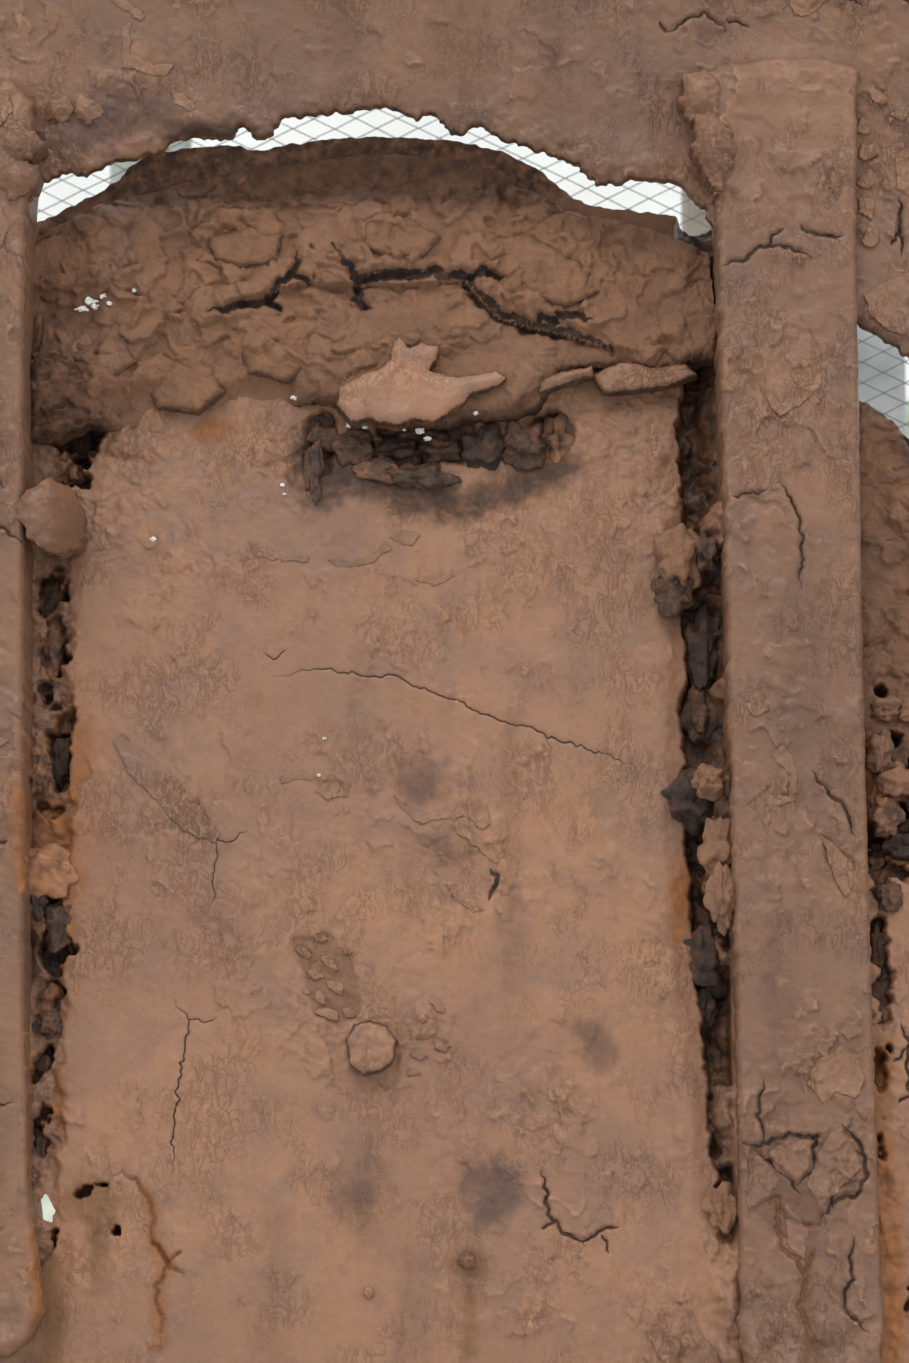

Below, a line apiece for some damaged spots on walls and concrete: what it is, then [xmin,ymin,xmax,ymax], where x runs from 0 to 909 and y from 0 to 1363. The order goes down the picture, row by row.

crack [265,650,643,768]
corrosion [859,401,909,968]
corrosion [14,580,86,1083]
crack [198,798,246,900]
corrosion [878,1002,890,1024]
corrosion [31,1089,60,1187]
corrosion [876,1040,892,1176]
corrosion [32,1227,54,1310]
crack [740,1080,870,1359]